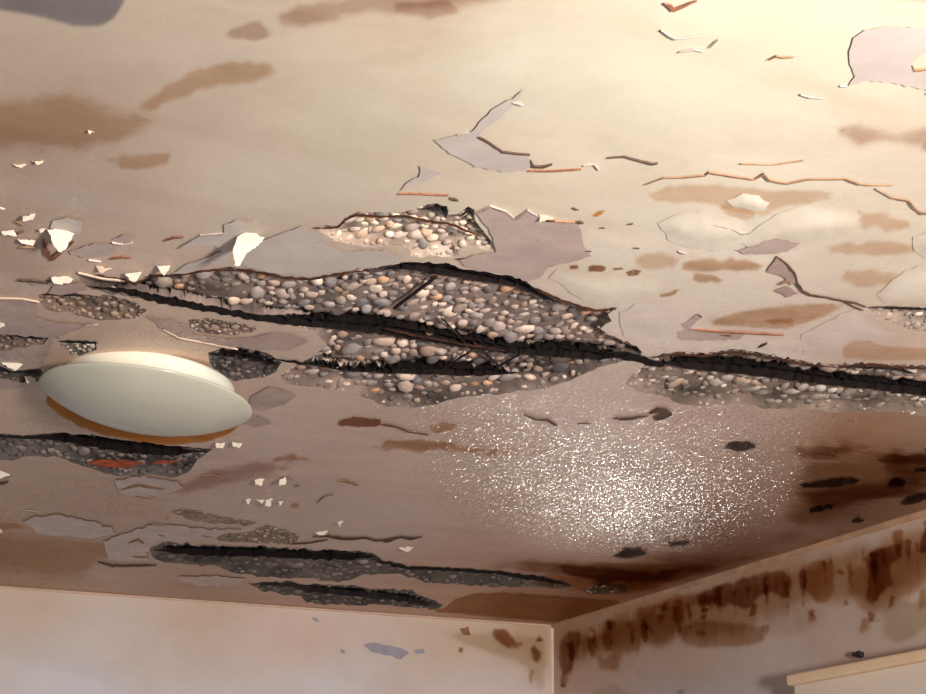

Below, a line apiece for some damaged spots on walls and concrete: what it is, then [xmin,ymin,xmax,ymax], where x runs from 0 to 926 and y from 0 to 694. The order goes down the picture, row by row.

peeling [840,26,926,90]
peeling [435,89,599,173]
peeling [607,155,658,166]
crack [645,160,926,215]
spalling [0,166,926,427]
crack [776,256,867,311]
spalling [0,432,242,499]
corrosion [88,459,184,468]
mould [802,477,858,488]
mould [901,493,926,505]
spalling [22,508,628,610]
damp [615,547,645,558]